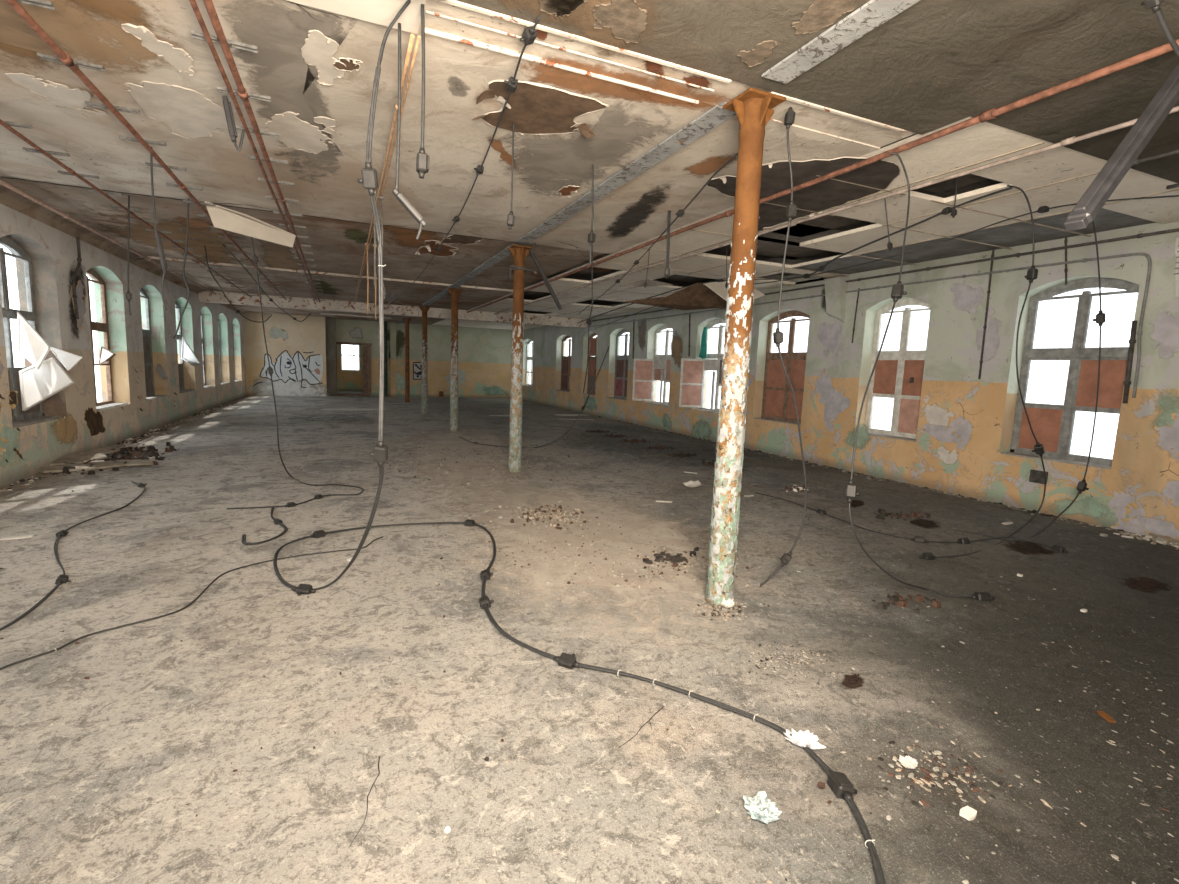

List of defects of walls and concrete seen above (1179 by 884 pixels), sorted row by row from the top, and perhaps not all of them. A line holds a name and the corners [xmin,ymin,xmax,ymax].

peeling [4,73,108,115]
leakage [0,0,178,73]
peeling [121,23,228,139]
peeling [265,111,336,154]
peeling [301,30,363,85]
flaking render [472,80,610,139]
peeling [538,0,648,43]
flaking render [681,156,900,604]
peeling [923,396,973,465]
peeling [1149,413,1179,460]
peeling [1100,660,1174,865]